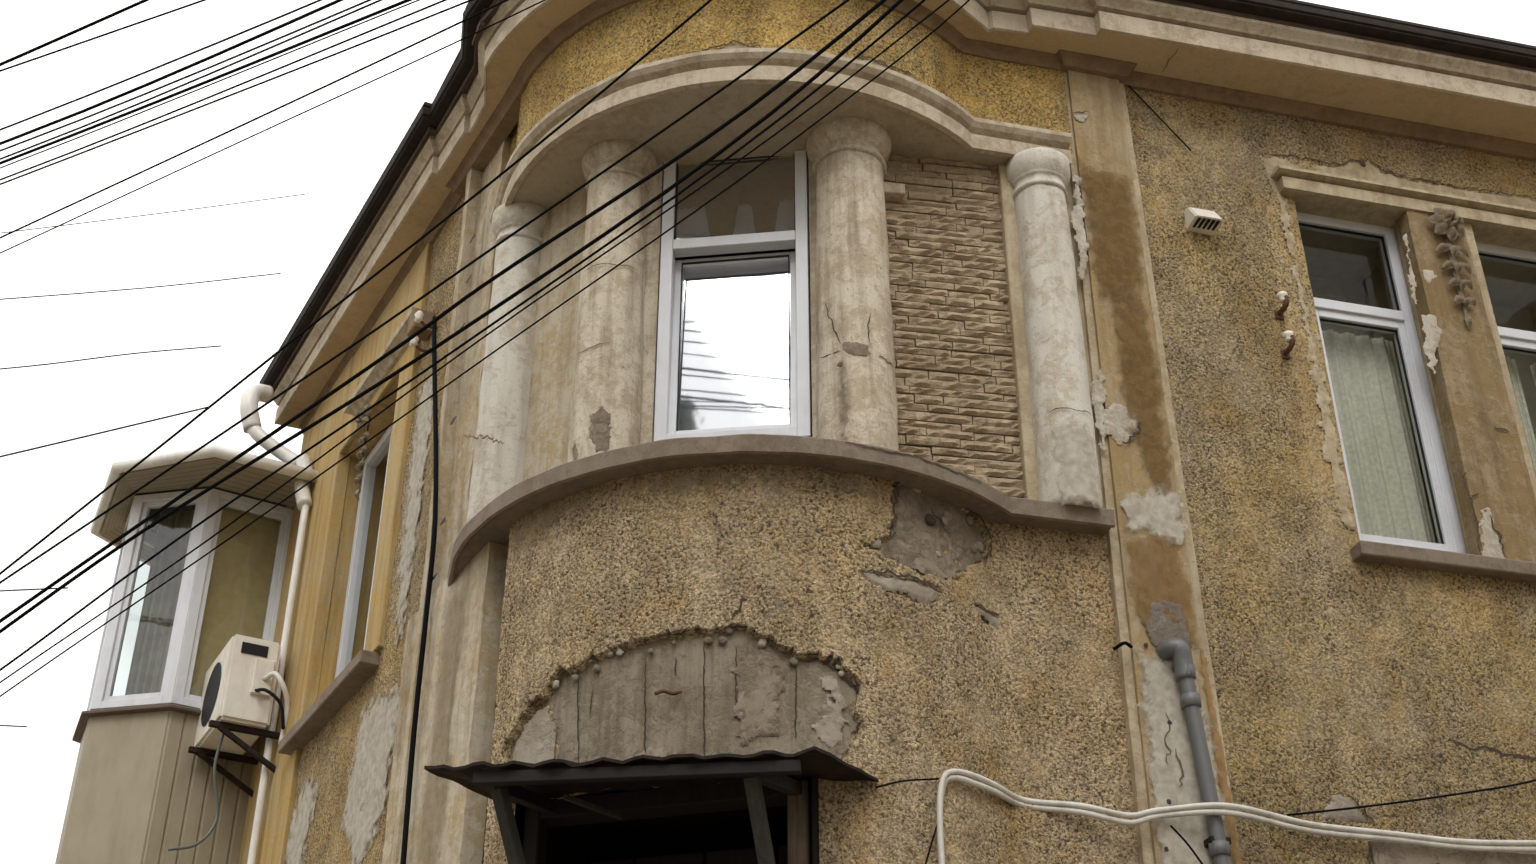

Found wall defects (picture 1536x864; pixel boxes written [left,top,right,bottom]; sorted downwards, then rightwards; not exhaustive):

flaking render [1070,175,1090,280]
flaking render [1260,153,1536,533]
flaking render [572,406,612,460]
flaking render [1052,369,1141,508]
flaking render [860,482,992,605]
flaking render [1120,485,1186,545]
flaking render [1479,507,1505,558]
flaking render [510,593,861,764]
flaking render [1136,600,1225,864]